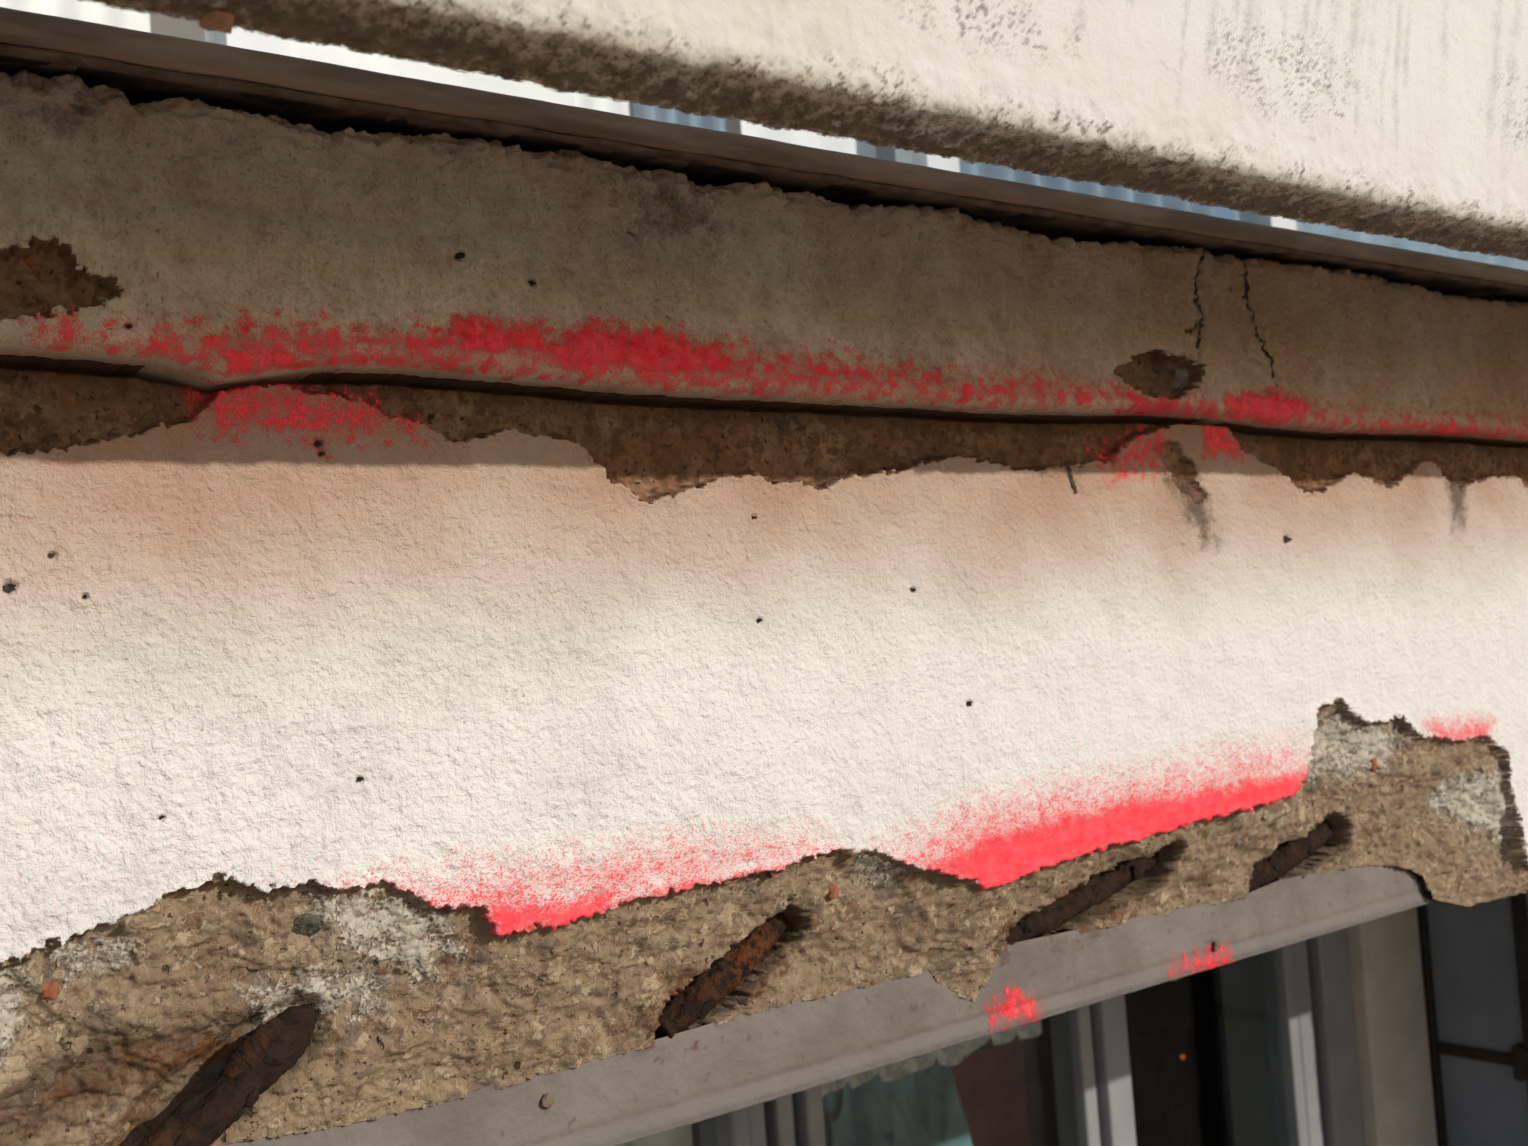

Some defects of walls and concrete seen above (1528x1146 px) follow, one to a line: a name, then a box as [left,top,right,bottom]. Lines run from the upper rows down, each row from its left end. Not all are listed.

flaking render [0,235,125,320]
crack [1185,248,1205,349]
crack [1241,261,1279,387]
peeling [0,346,1528,505]
spalling [0,697,1528,1146]
rust [42,1033,227,1146]